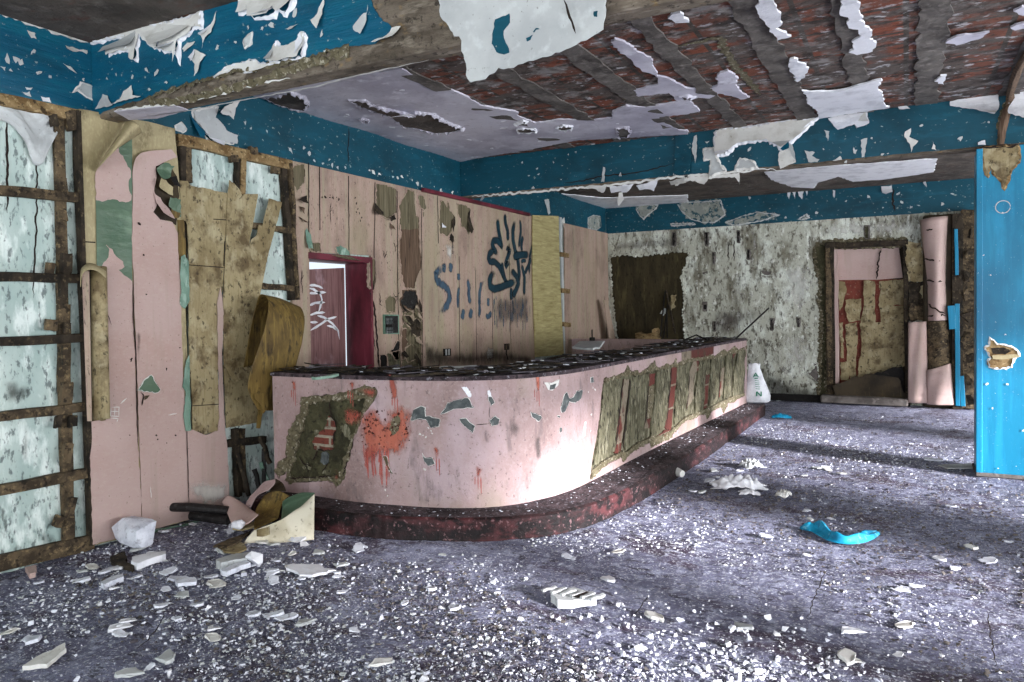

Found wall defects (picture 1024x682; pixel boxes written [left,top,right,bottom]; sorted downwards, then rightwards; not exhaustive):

flaking render [0,0,349,145]
peeling [353,5,368,34]
peeling [439,0,606,82]
peeling [950,91,1024,123]
flaking render [545,112,986,227]
peeling [333,169,474,369]
leakage [608,248,694,339]
flaking render [274,384,377,487]
rust [361,375,410,486]
flaking render [545,346,747,480]
leakage [769,380,808,395]
spalling [984,334,1021,370]